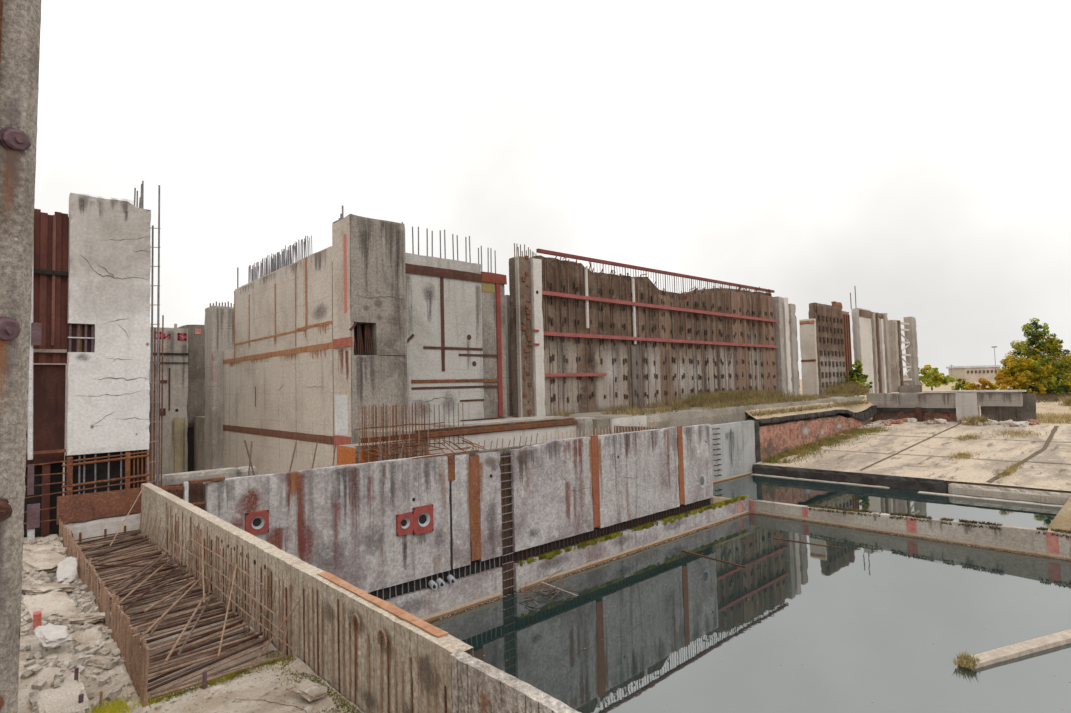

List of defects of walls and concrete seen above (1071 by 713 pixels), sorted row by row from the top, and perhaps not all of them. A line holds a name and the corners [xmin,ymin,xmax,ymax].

crack [79,236,150,280]
crack [87,319,149,426]
rust [233,494,257,528]
rust [267,472,313,561]
rust [566,483,576,519]
rust [566,439,602,504]